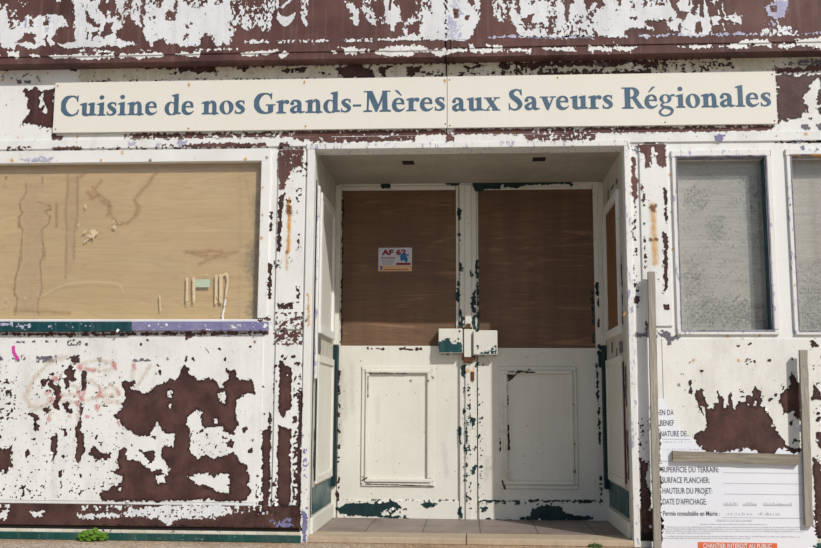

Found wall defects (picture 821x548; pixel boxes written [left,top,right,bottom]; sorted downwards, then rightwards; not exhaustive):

peeling [0,0,821,355]
rust [649,204,659,265]
peeling [0,347,315,542]
peeling [335,345,603,521]
peeling [591,282,601,445]
peeling [689,372,801,454]
peeling [811,382,821,536]